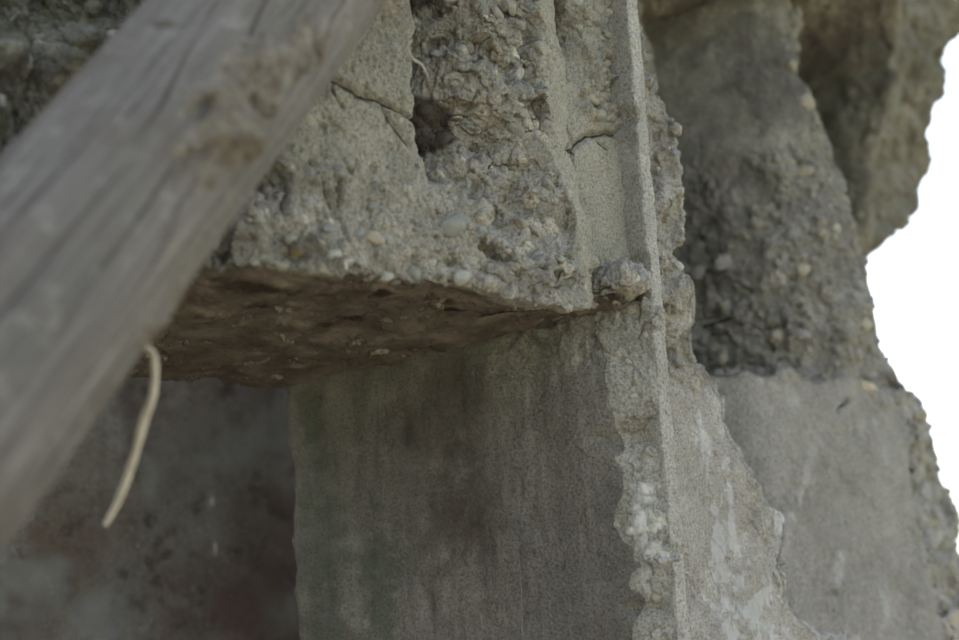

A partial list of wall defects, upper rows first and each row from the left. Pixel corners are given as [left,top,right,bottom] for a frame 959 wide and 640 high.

spalling [0,0,144,155]
crack [330,81,405,144]
crack [566,133,613,151]
spalling [199,0,695,640]
spalling [639,0,959,640]